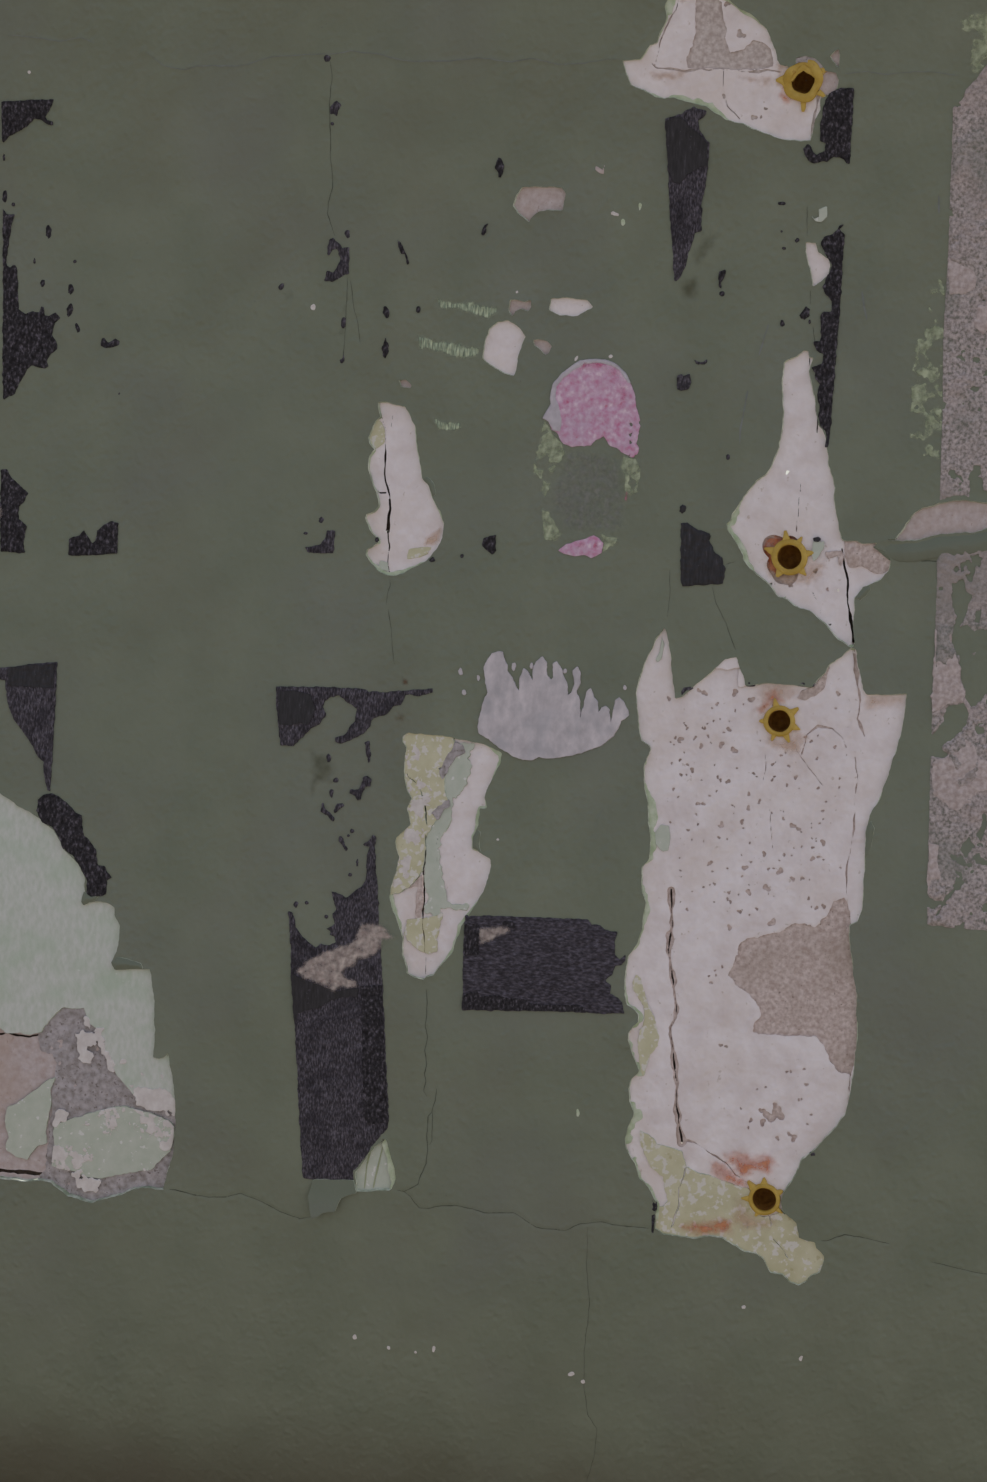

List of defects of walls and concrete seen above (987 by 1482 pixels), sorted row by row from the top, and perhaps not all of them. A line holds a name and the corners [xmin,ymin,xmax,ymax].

peeling [624,0,840,141]
peeling [367,403,444,575]
peeling [895,501,987,541]
peeling [390,733,502,978]
peeling [625,351,907,1284]
peeling [0,794,176,1200]
peeling [356,1139,396,1190]